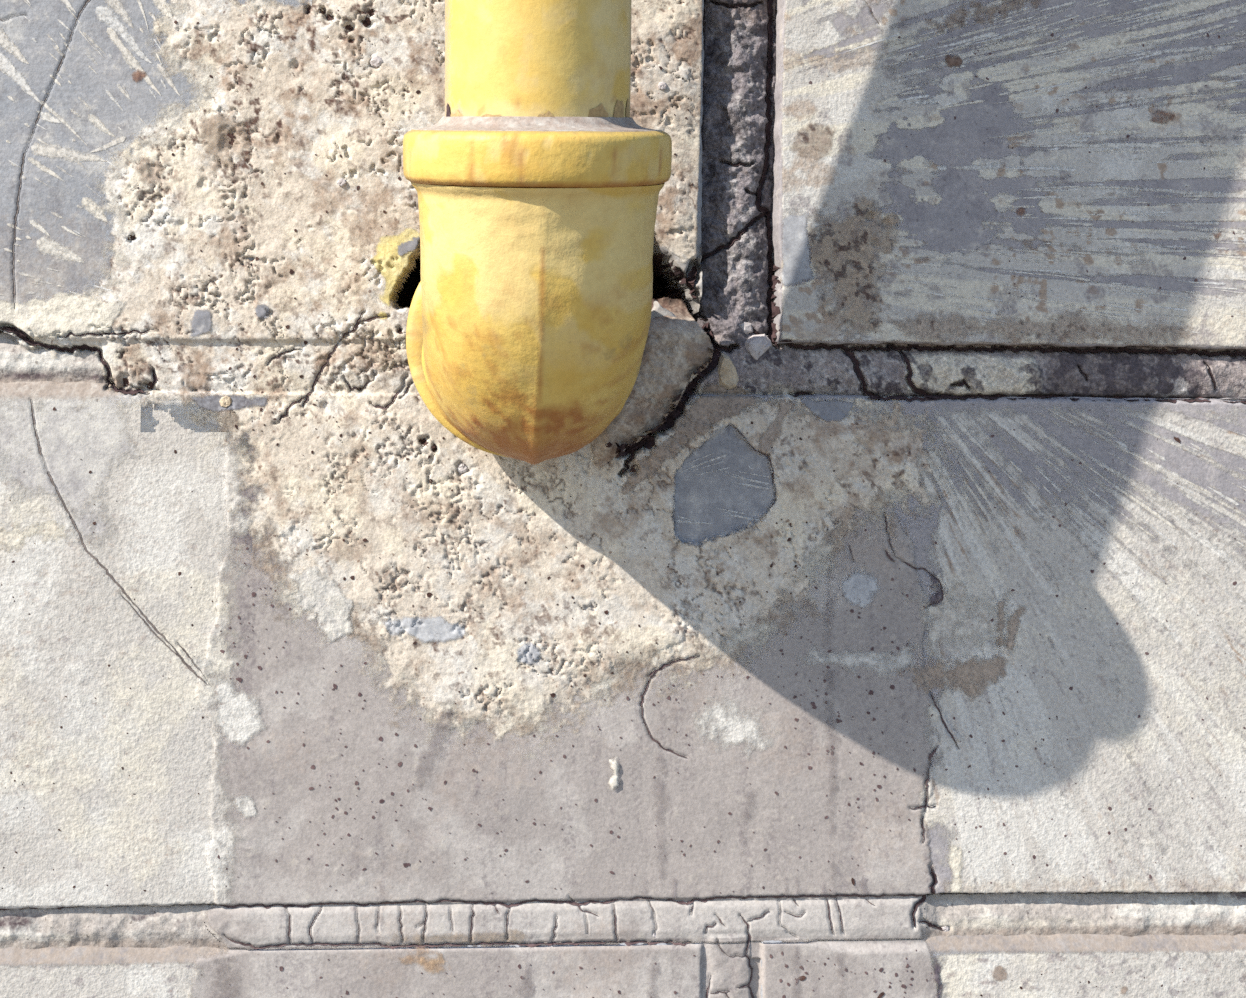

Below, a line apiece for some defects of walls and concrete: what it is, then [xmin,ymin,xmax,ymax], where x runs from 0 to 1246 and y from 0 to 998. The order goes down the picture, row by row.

spalling [307,7,374,43]
crack [0,0,158,395]
spalling [781,214,814,286]
crack [615,0,1246,475]
spalling [190,310,211,337]
spalling [191,395,267,411]
spalling [255,304,270,320]
crack [279,312,412,420]
spalling [739,322,772,360]
spalling [673,425,775,546]
crack [640,656,698,758]
crack [0,695,1246,998]